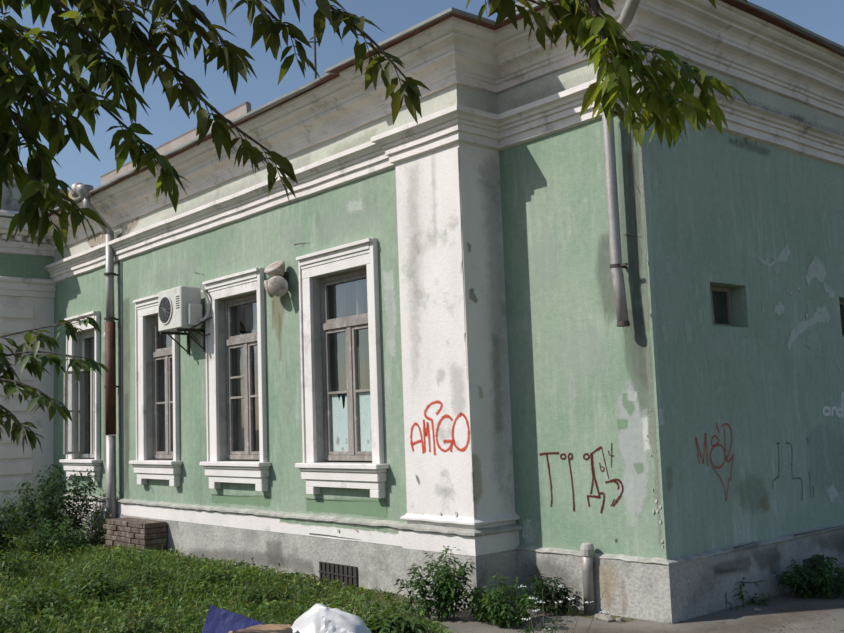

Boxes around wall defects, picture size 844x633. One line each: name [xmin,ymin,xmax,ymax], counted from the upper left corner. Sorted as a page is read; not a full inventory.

peeling [616,147,664,547]